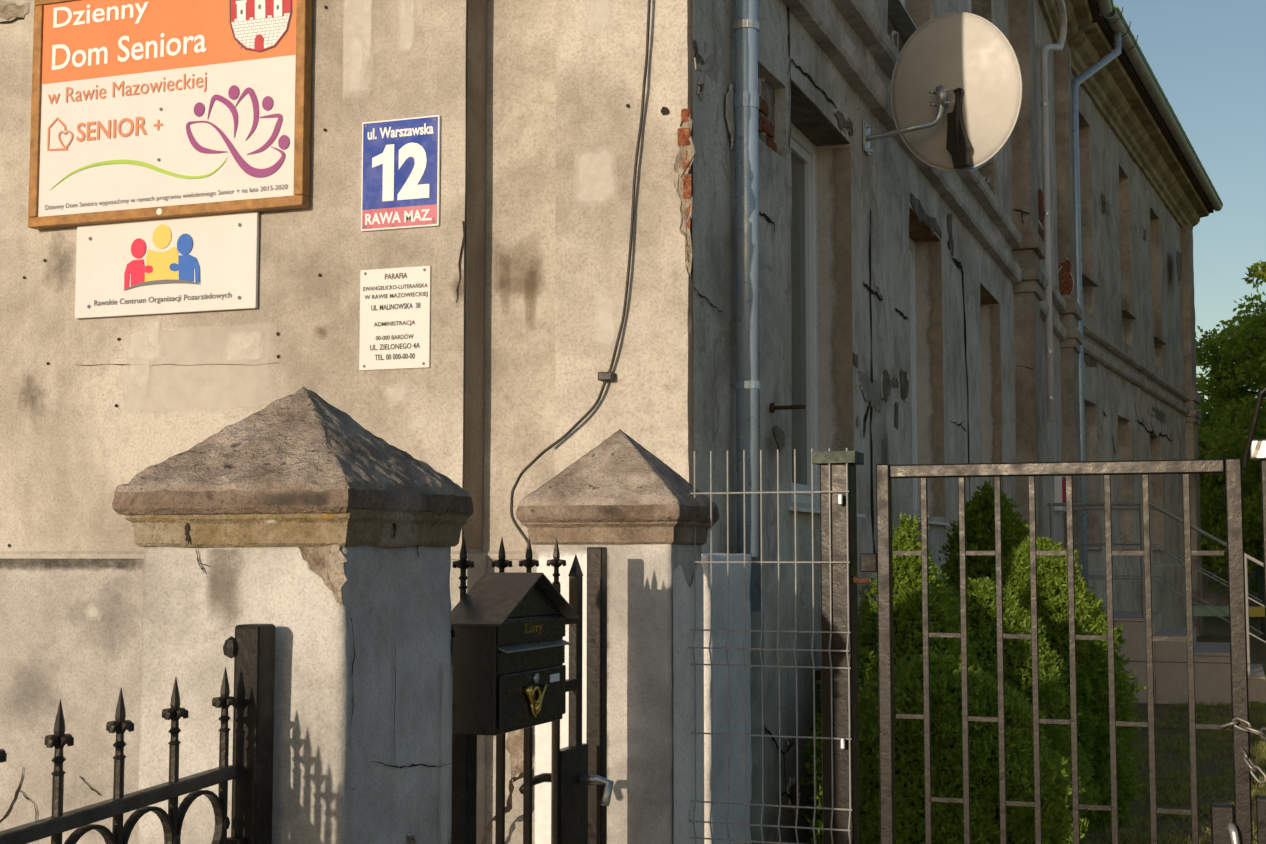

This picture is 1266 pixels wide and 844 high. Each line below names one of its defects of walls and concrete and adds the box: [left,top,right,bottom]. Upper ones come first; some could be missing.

flaking render [758,77,777,153]
flaking render [673,40,705,276]
peeling [832,109,860,451]
flaking render [1058,257,1074,297]
flaking render [881,369,910,429]
flaking render [297,544,347,607]
crack [375,643,455,769]